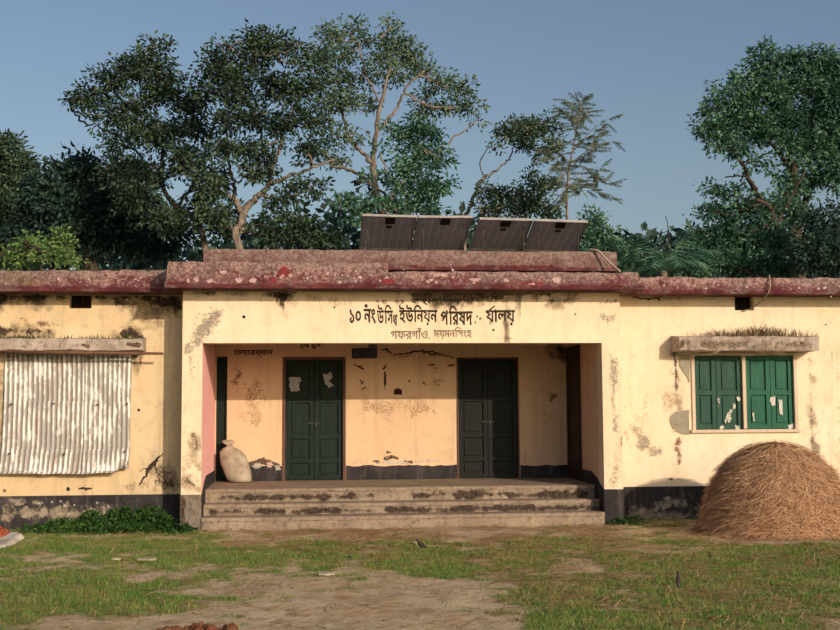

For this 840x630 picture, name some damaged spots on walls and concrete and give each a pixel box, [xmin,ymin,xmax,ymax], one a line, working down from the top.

peeling [235,266,311,283]
peeling [322,269,404,284]
damp [0,294,65,304]
damp [94,295,182,317]
damp [408,292,551,306]
damp [0,318,51,336]
damp [120,327,145,338]
crack [353,348,455,390]
peeling [719,397,740,430]
spalling [354,451,440,464]
crack [139,453,164,485]
peeling [0,489,110,522]